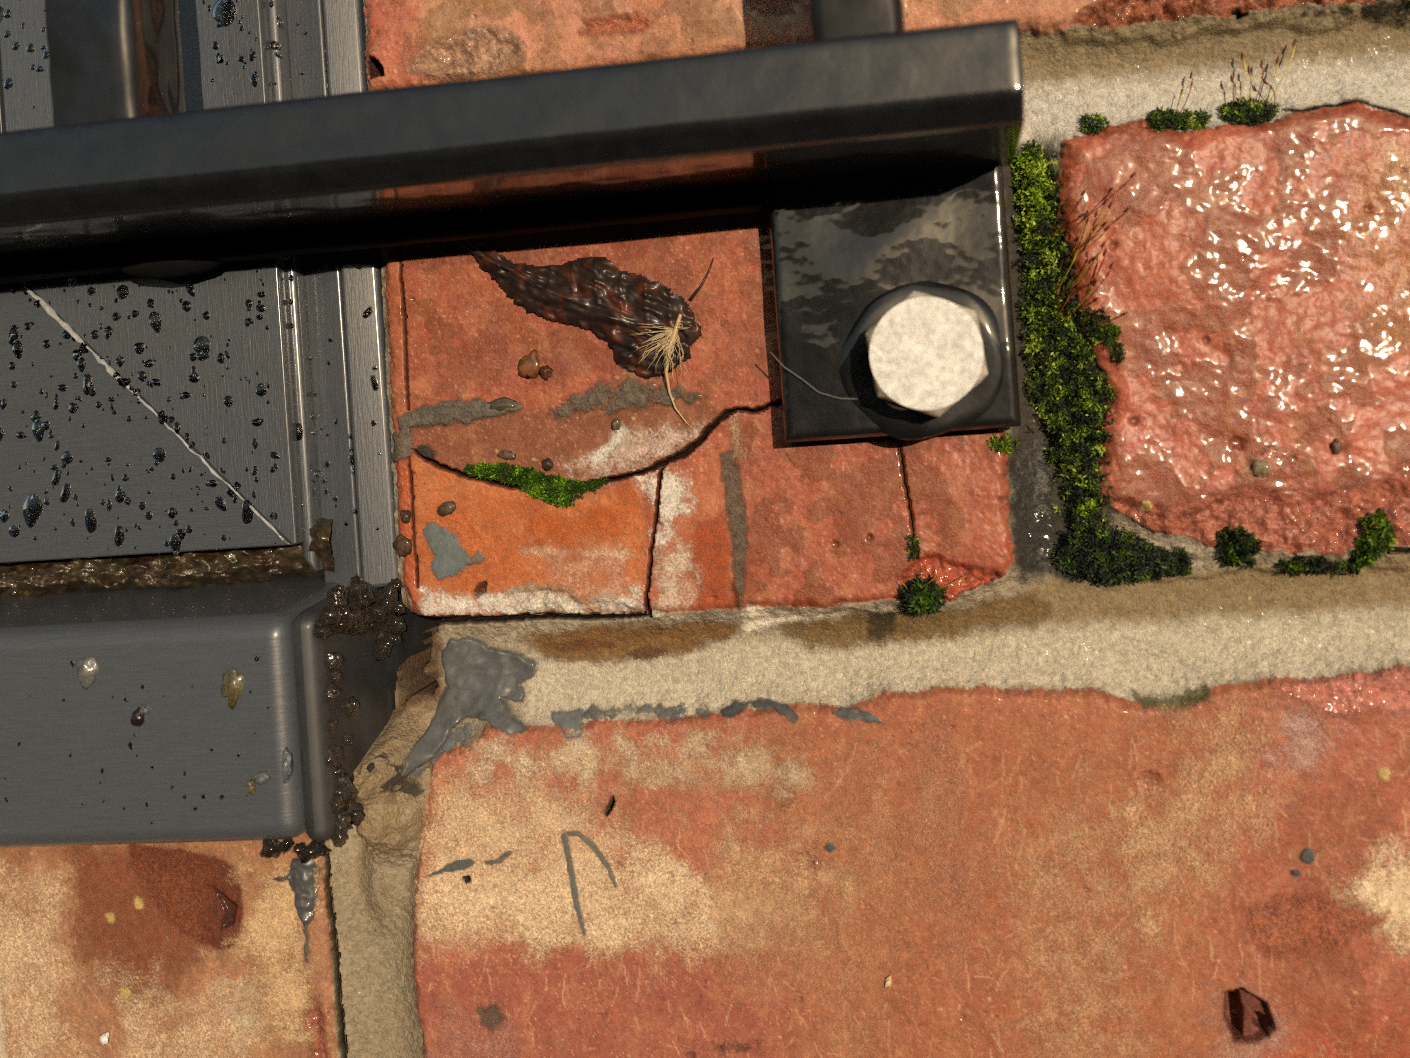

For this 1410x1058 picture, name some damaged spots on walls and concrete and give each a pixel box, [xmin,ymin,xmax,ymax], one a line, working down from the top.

spalling [1076,0,1378,29]
crack [397,246,410,409]
crack [407,400,782,626]
spalling [1224,987,1276,1044]